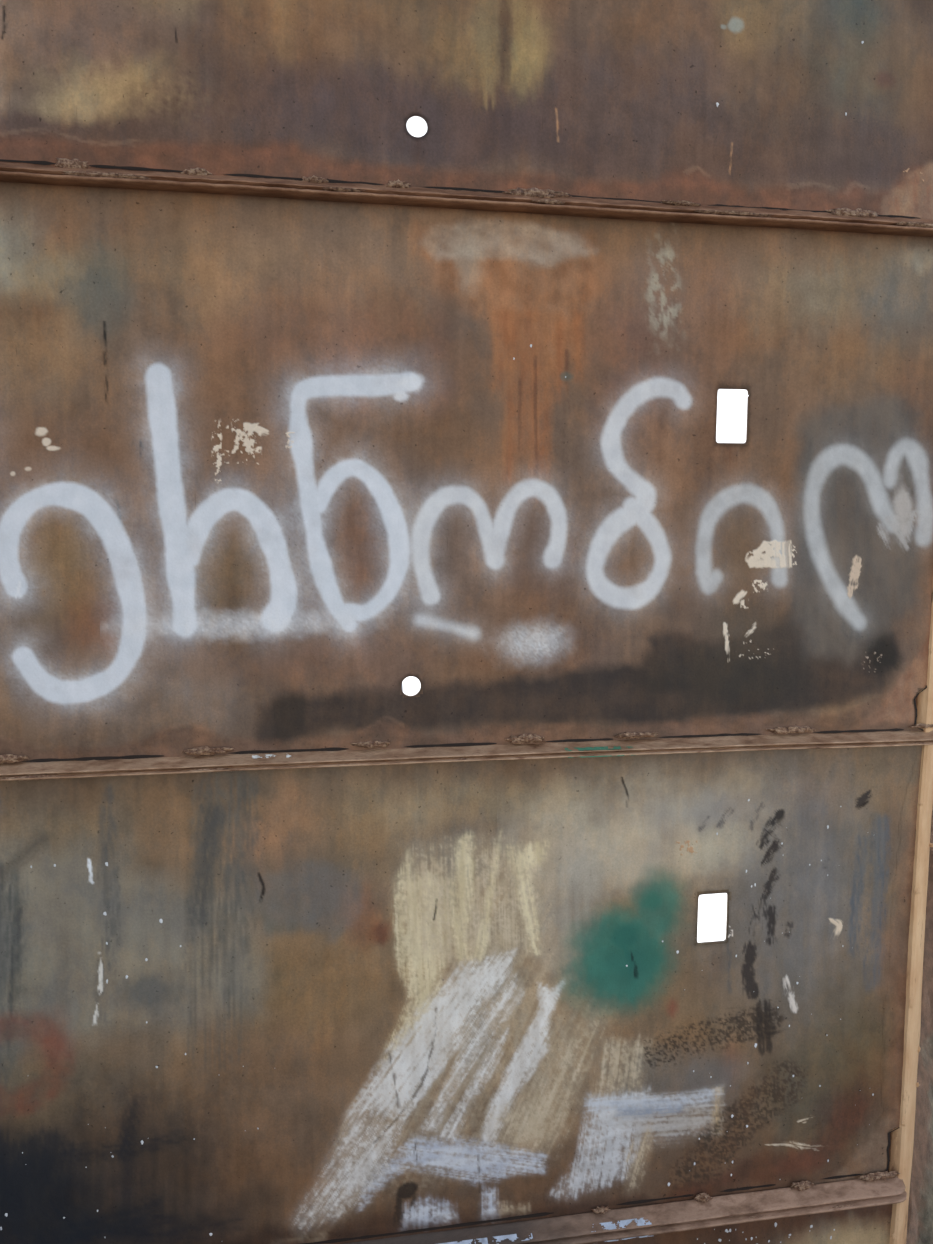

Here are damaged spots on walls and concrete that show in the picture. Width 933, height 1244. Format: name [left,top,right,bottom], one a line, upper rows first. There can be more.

rust [876,156,933,219]
rust [398,212,623,459]
peeling [210,417,296,484]
peeling [722,539,797,663]
peeling [845,553,864,600]